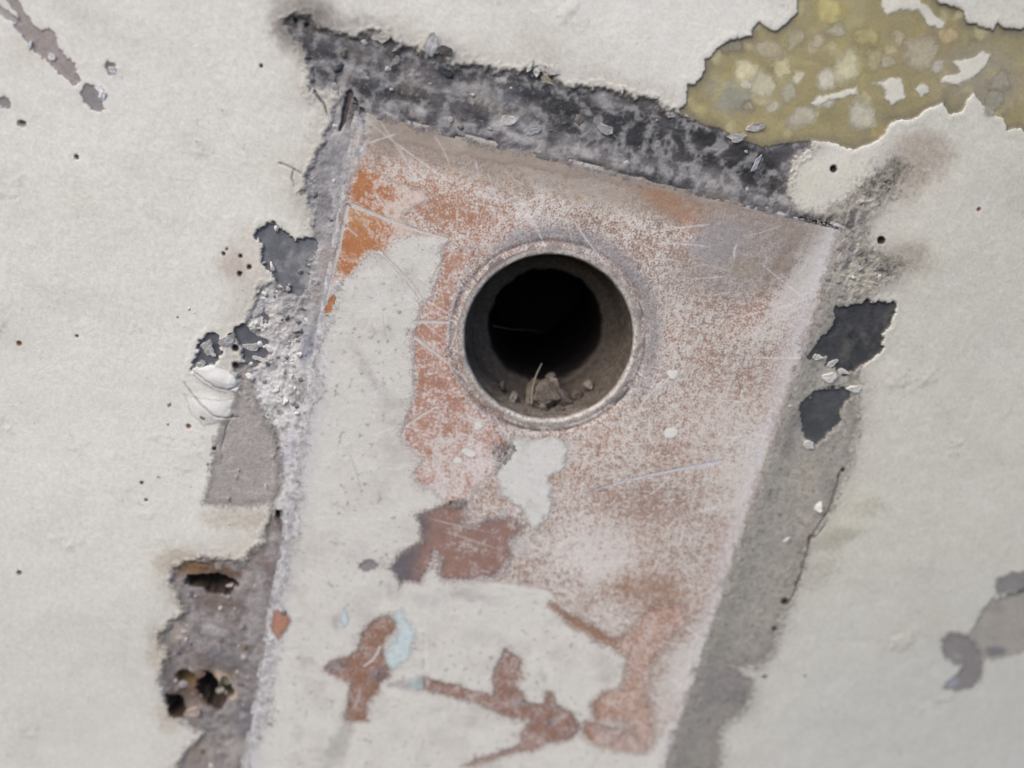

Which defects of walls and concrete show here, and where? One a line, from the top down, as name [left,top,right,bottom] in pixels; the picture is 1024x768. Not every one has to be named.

peeling [0,0,107,111]
spalling [679,0,1024,149]
spalling [159,14,905,768]
crack [790,474,839,599]
peeling [941,572,1024,691]